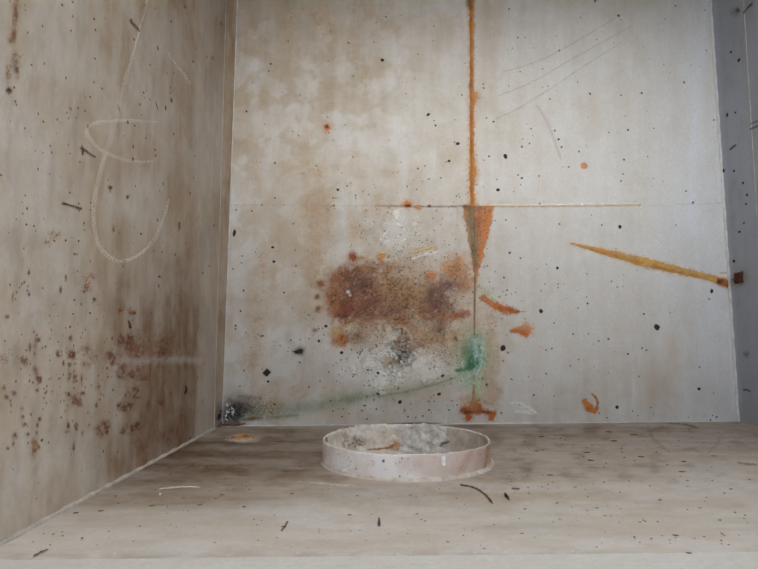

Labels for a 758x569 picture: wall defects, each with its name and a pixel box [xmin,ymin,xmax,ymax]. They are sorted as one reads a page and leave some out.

rust [315,0,520,345]
rust [571,243,734,287]
rust [510,324,532,337]
rust [107,352,145,412]
damp [217,397,279,426]
damp [455,334,486,384]
rust [460,374,495,421]
rust [582,393,600,414]